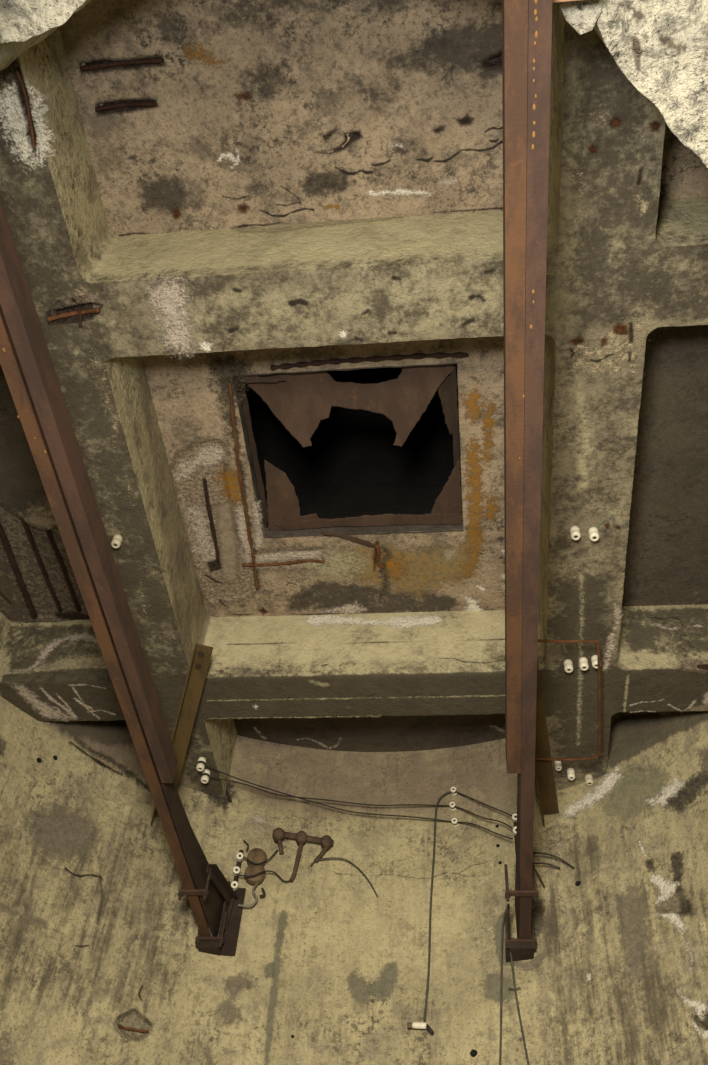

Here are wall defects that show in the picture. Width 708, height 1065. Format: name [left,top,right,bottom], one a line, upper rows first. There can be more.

spalling [632,35,642,70]
spalling [659,34,686,53]
crack [416,127,503,163]
crack [223,160,390,229]
peeling [633,168,649,217]
damp [146,275,249,438]
rust [301,388,499,600]
spalling [0,505,90,623]
damp [264,911,287,1065]
damp [347,963,397,1003]
damp [616,874,708,1039]
spalling [114,1009,154,1042]